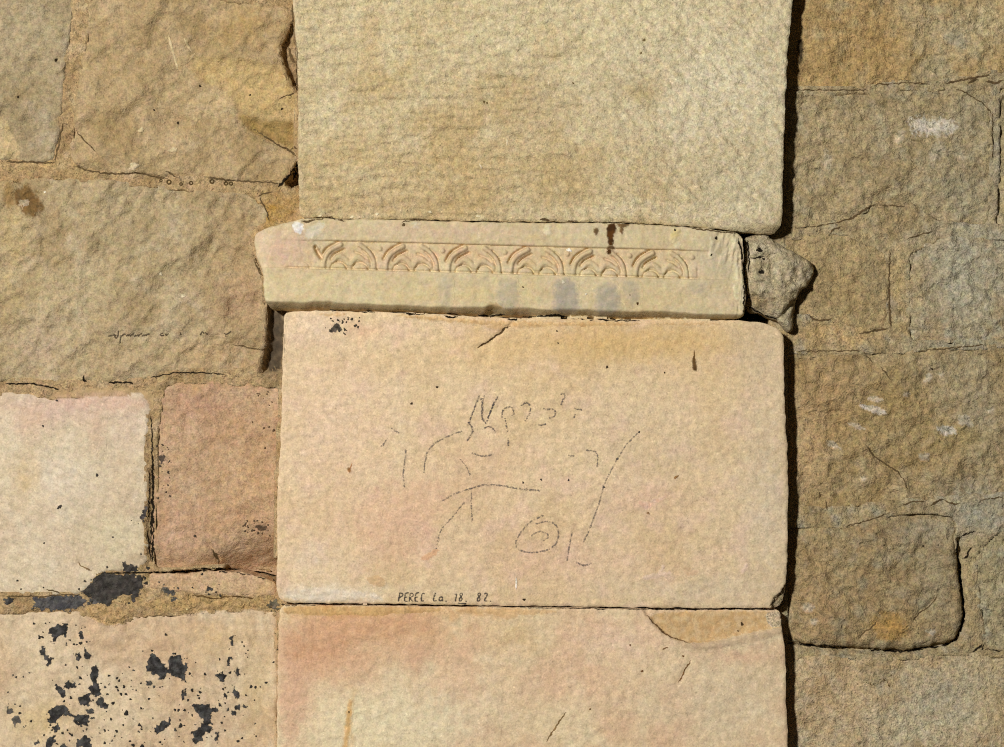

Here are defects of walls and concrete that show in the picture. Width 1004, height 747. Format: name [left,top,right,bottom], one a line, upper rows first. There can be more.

corrosion [592,220,631,256]
crack [406,312,637,348]
spalling [647,582,789,657]
leakage [31,562,449,747]
leakage [6,691,32,728]